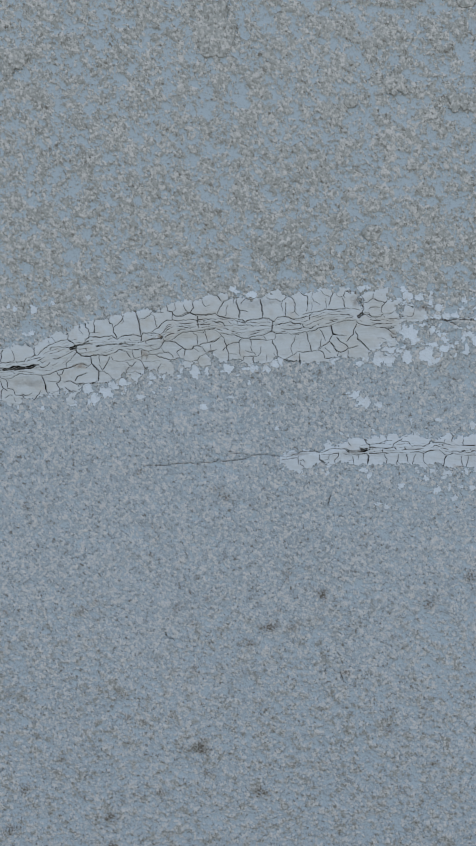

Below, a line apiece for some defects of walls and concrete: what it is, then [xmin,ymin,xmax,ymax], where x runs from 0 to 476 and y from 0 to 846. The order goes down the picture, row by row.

peeling [0,284,476,411]
crack [414,311,476,325]
peeling [278,419,476,501]